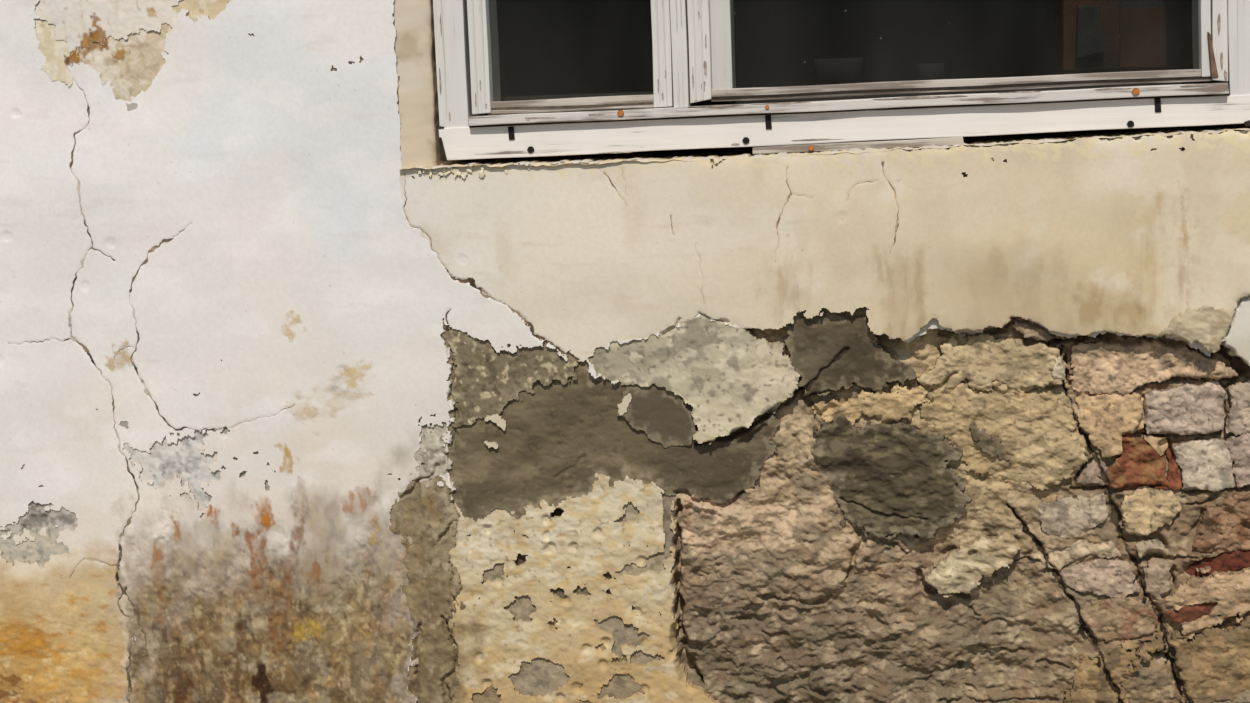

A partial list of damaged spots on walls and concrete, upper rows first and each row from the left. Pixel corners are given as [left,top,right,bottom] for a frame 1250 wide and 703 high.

rust [65,16,130,65]
peeling [34,0,230,112]
crack [603,169,627,205]
crack [775,167,812,259]
crack [847,161,899,266]
crack [9,78,294,703]
peeling [0,501,78,569]
peeling [119,421,247,519]
flaking render [389,305,1250,703]
crack [1062,380,1194,703]
water stain [0,506,427,703]
crack [1006,503,1123,703]